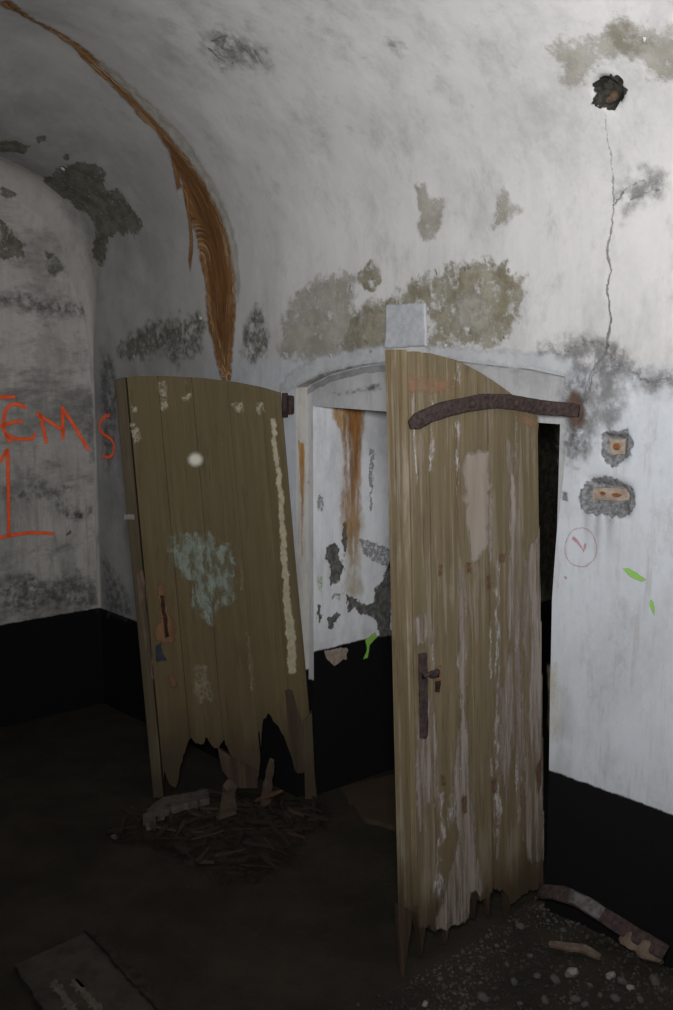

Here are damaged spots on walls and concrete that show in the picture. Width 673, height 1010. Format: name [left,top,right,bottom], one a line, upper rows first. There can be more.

peeling [553,24,673,110]
peeling [43,154,143,267]
corrosion [0,1,239,381]
crack [583,175,670,383]
leakage [566,340,630,420]
corrosion [334,408,364,593]
spalling [579,429,635,518]
peeling [317,521,392,637]